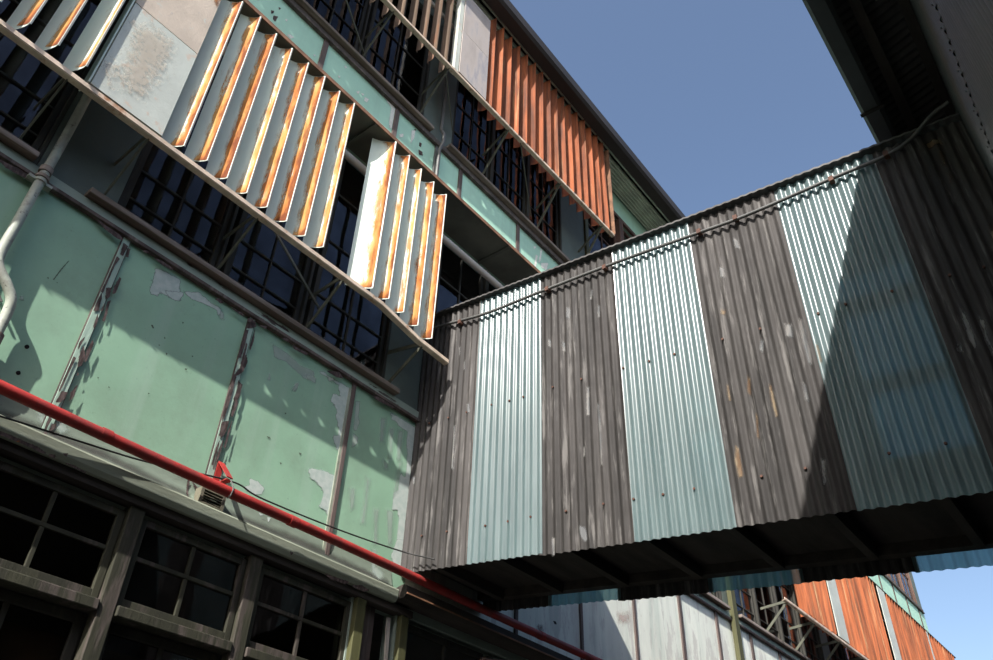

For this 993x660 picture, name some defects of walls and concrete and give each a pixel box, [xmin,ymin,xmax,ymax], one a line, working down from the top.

rust [17,0,47,26]
rust [45,0,86,47]
rust [78,0,125,67]
rust [171,2,277,178]
rust [235,49,355,247]
peeling [56,220,130,403]
peeling [143,250,267,465]
peeling [308,468,334,523]
peeling [320,371,360,451]
rust [360,142,447,338]